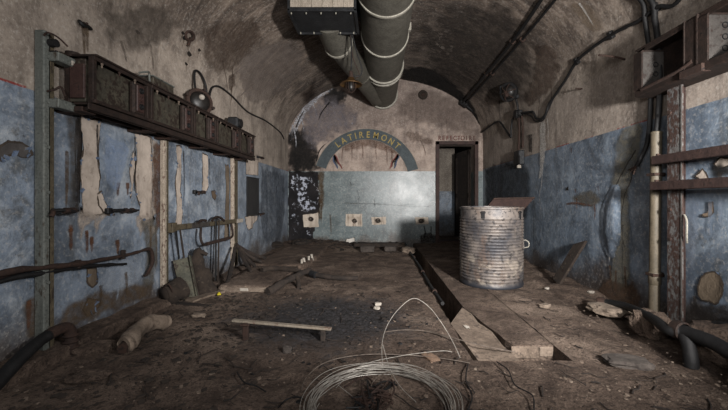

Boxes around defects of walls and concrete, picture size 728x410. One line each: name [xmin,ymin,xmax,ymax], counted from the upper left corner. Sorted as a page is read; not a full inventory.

peeling [0,140,34,163]
peeling [72,115,115,236]
peeling [129,133,157,236]
peeling [175,145,185,224]
peeling [202,153,217,200]
peeling [697,271,724,305]